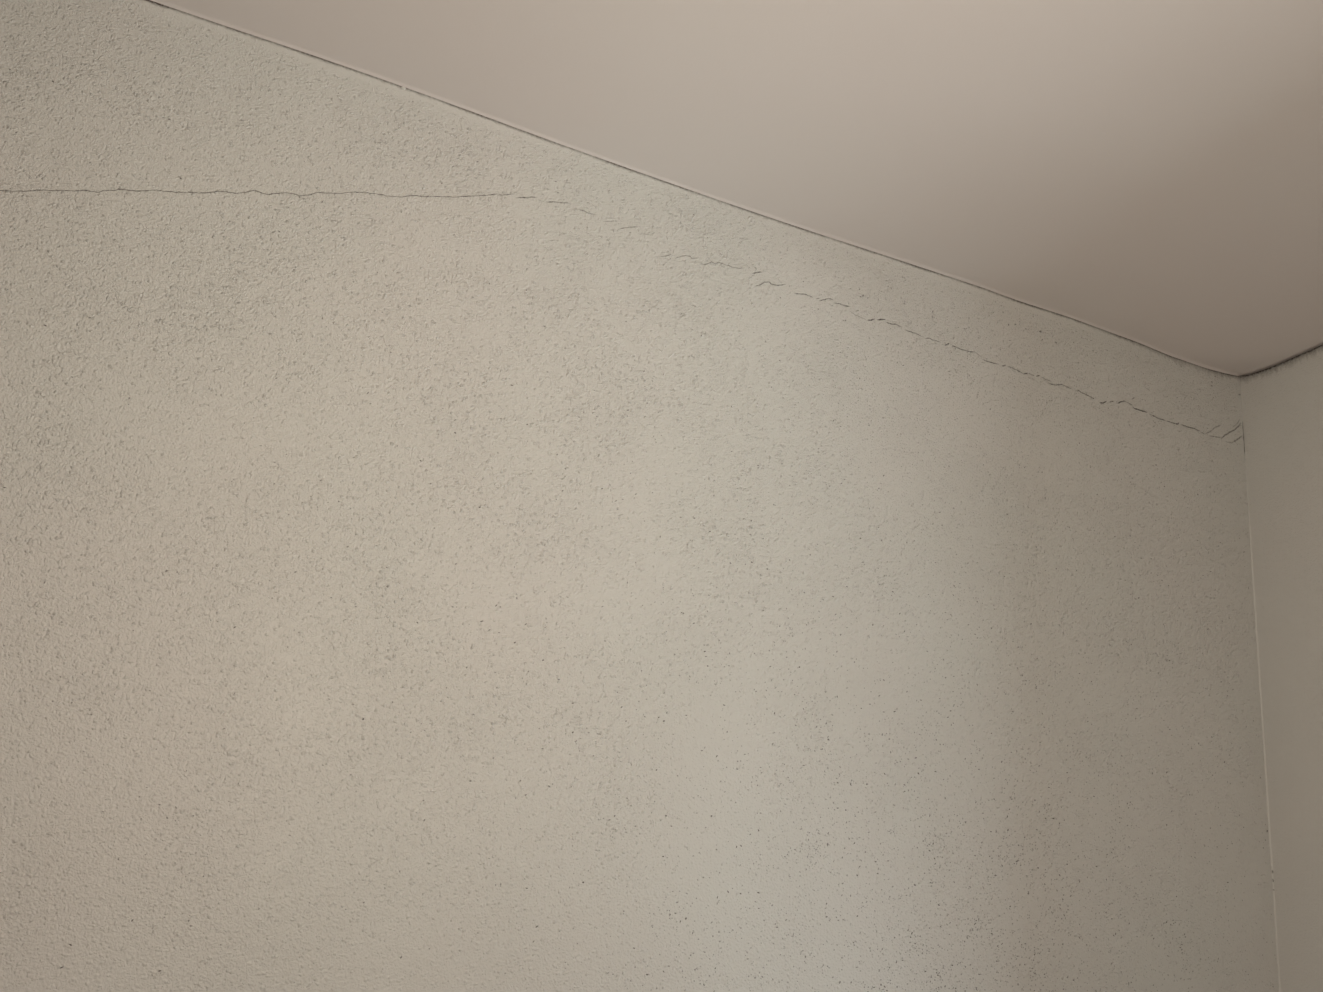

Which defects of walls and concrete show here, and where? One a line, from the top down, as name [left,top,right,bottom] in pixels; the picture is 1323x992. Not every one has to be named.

crack [596,157,700,194]
crack [731,204,1322,377]